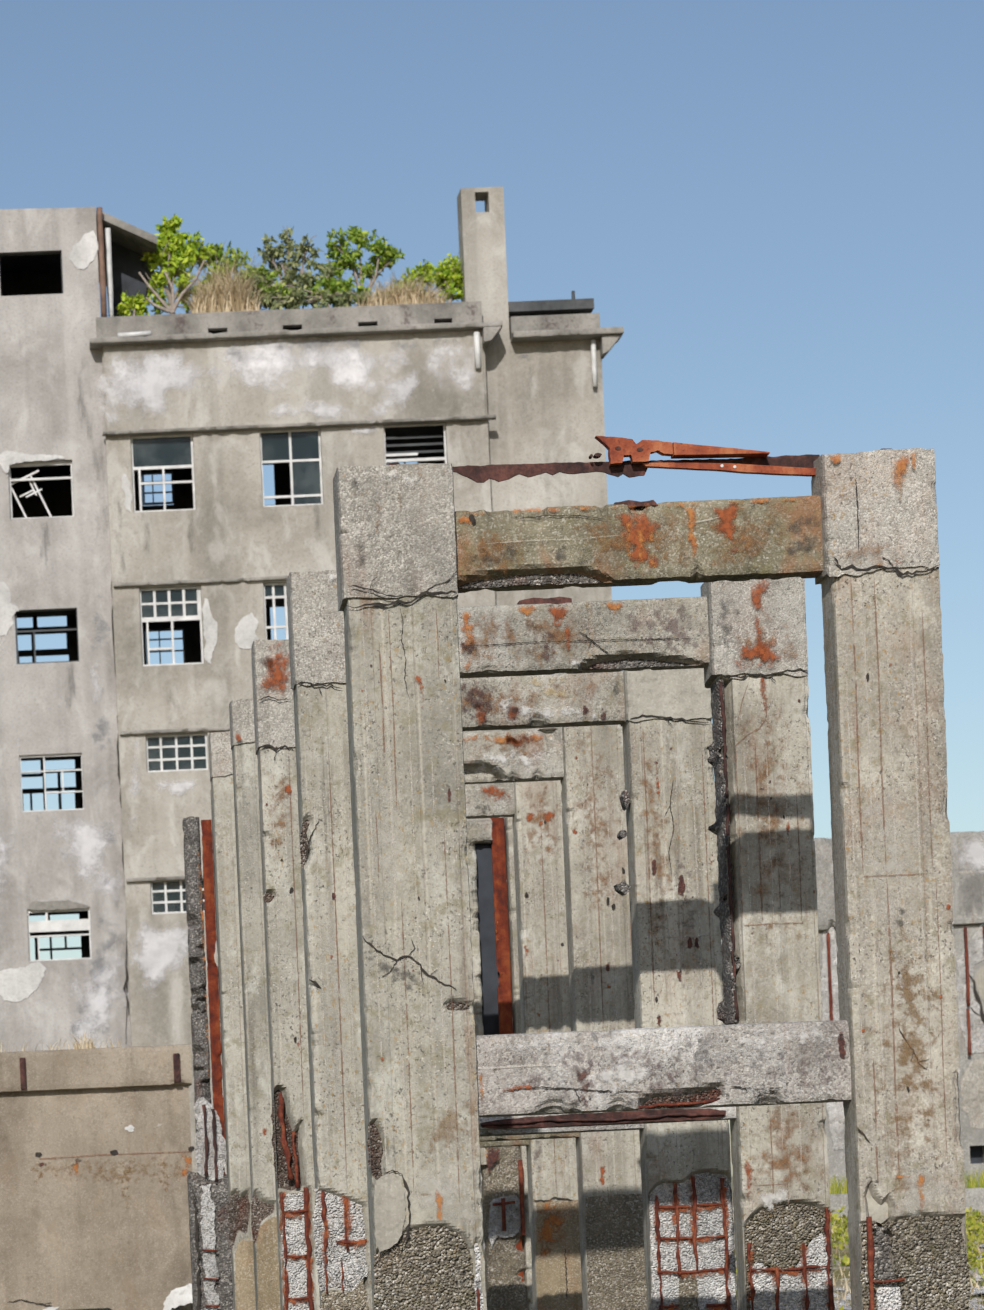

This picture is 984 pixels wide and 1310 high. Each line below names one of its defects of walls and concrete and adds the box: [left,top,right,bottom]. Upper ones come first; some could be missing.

efflorescence [102,354,194,412]
leakage [278,404,339,416]
leakage [227,339,417,412]
corrosion [598,500,697,567]
peeling [0,582,19,636]
corrosion [736,580,796,710]
peeling [0,962,47,1002]
crack [363,937,456,990]
crack [969,974,984,1023]
spalling [163,1089,835,1310]
spalling [860,1189,971,1310]